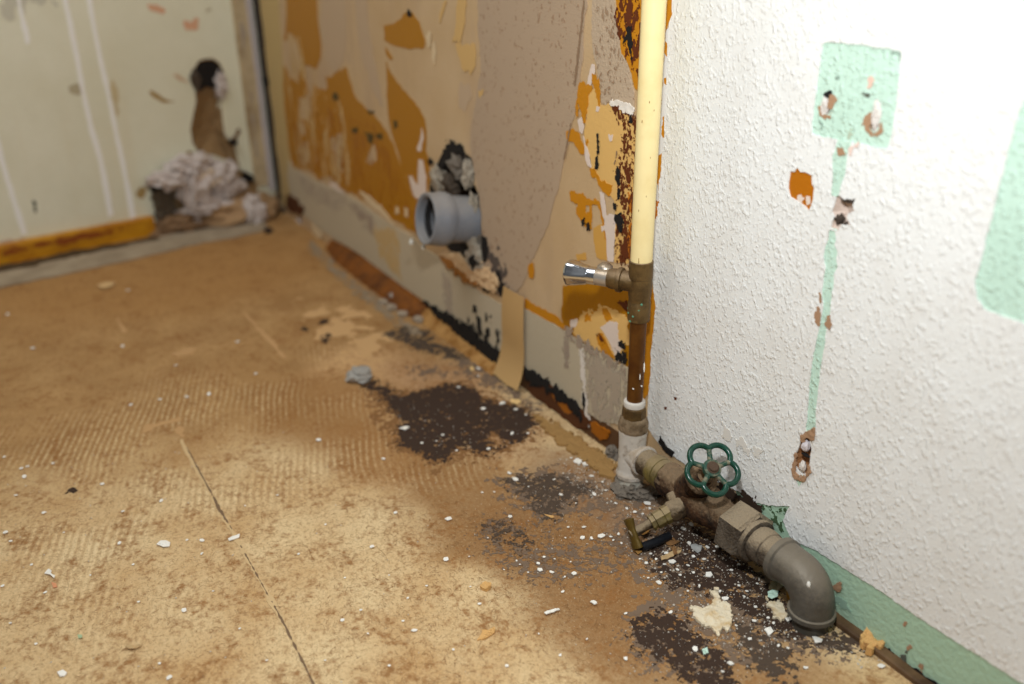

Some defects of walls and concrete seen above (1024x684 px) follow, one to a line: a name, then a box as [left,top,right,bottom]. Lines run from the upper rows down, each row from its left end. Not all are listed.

spalling [187,58,258,193]
peeling [283,0,479,234]
flaking render [439,230,500,294]
peeling [524,284,630,366]
peeling [566,64,636,264]
rust [612,105,636,267]
rust [614,0,641,76]
peeling [616,0,642,91]
peeling [643,0,672,399]
peeling [789,168,814,209]
peeling [796,42,901,487]
water stain [300,271,872,684]